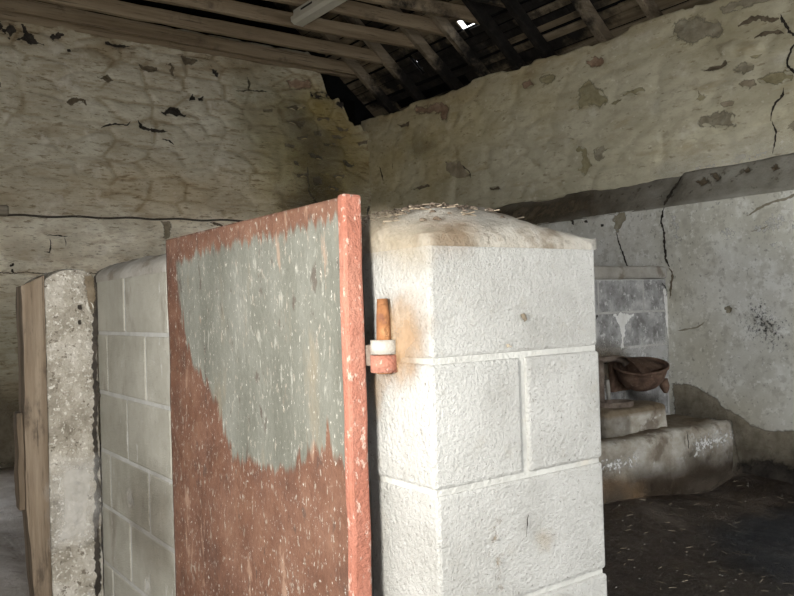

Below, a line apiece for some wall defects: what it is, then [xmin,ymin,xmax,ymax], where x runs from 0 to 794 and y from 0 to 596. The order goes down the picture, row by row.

peeling [674,0,769,43]
peeling [577,80,645,109]
peeling [699,100,736,128]
crack [738,14,794,154]
crack [660,176,682,296]
water stain [613,312,634,350]
water stain [744,303,790,348]